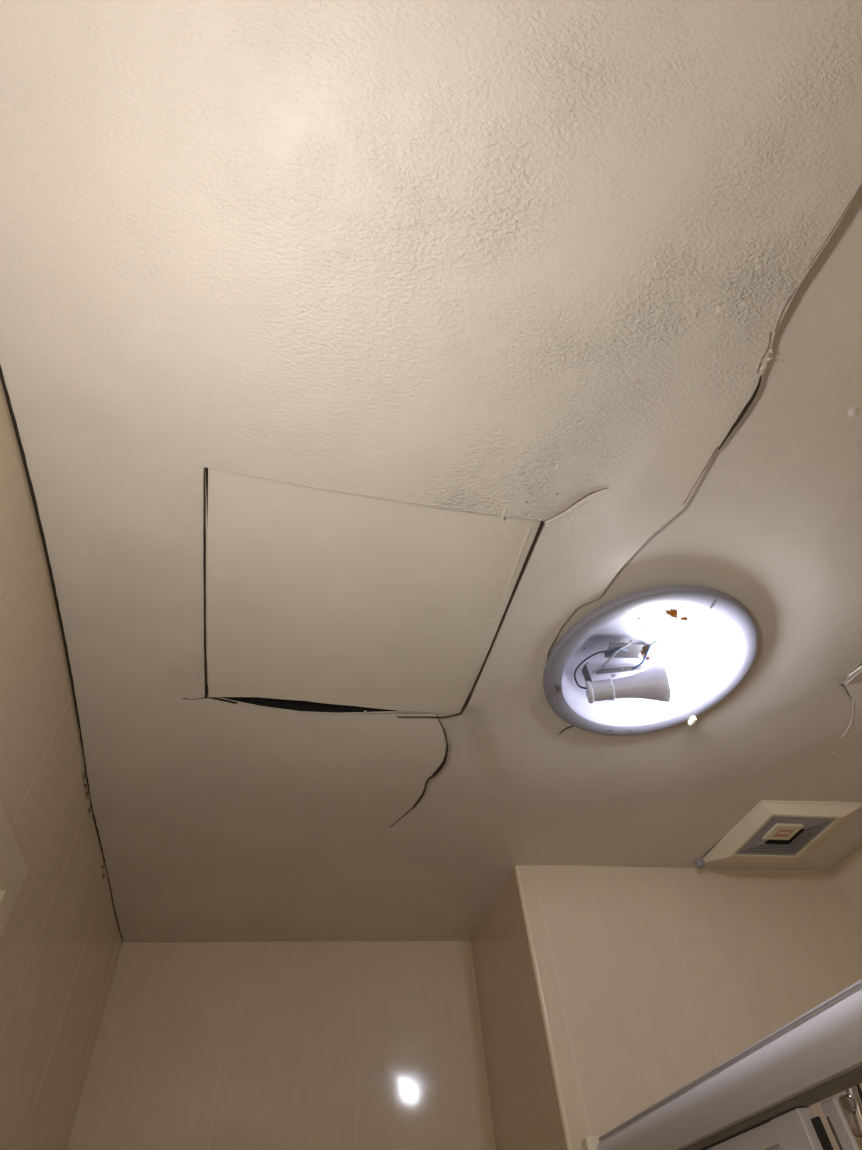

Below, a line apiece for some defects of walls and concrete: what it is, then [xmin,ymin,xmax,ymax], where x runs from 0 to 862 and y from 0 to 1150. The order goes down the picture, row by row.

crack [683,183,862,505]
crack [182,467,609,828]
crack [778,664,862,738]